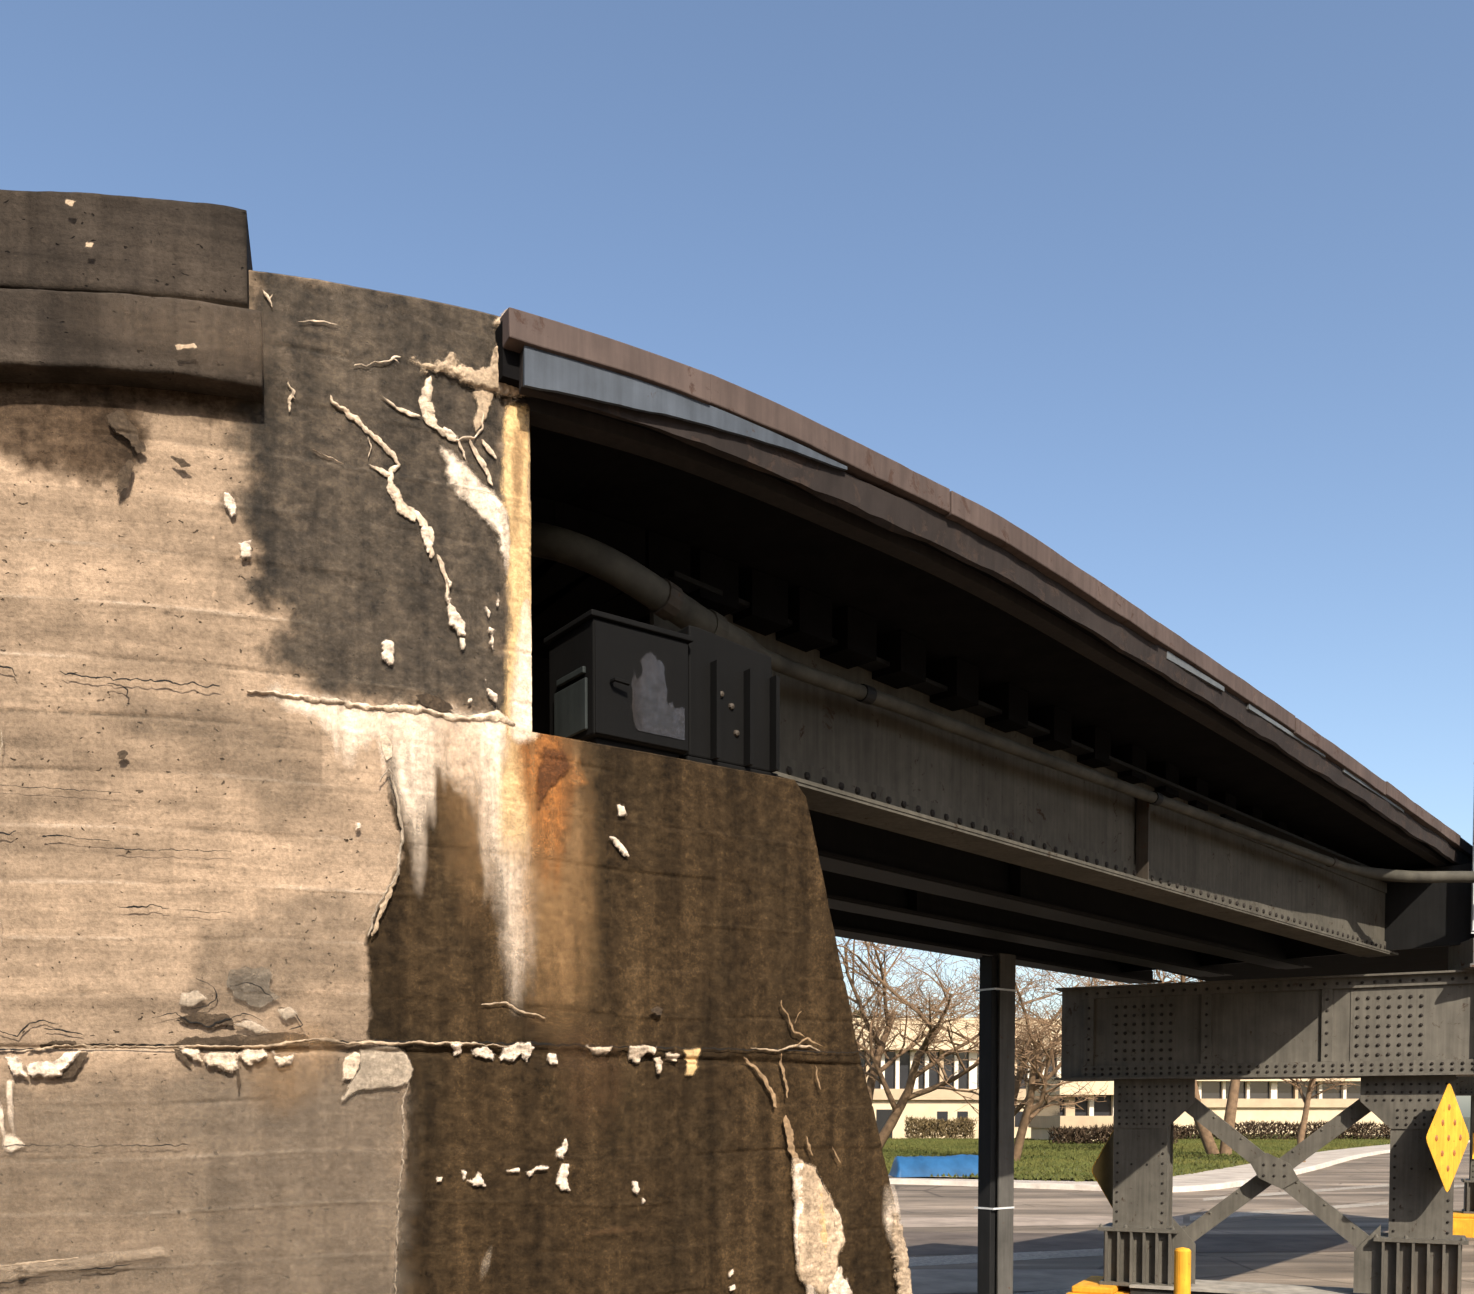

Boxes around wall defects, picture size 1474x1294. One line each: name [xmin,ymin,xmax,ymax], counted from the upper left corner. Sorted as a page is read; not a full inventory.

crack [263,290,337,325]
crack [287,356,496,597]
water stain [0,271,901,1294]
crack [367,768,404,936]
rust [503,733,584,957]
peeling [342,1047,413,1100]
crack [0,1000,858,1090]
crack [4,1141,189,1149]
crack [394,1084,409,1294]
crack [806,1136,841,1163]
crack [79,1263,130,1271]